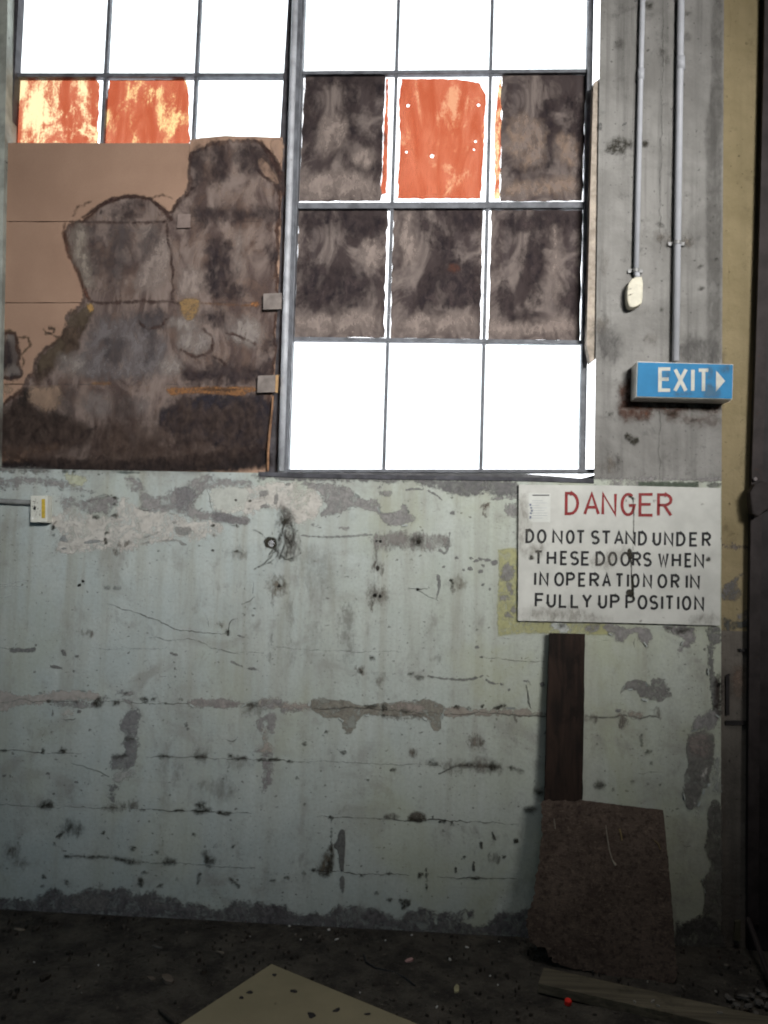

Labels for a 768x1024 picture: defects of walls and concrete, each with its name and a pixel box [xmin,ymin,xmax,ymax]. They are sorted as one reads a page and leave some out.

flaking render [0,467,519,555]
crack [118,596,256,670]
peeling [585,623,652,647]
spalling [0,690,101,712]
peeling [621,678,672,702]
peeling [663,615,747,948]